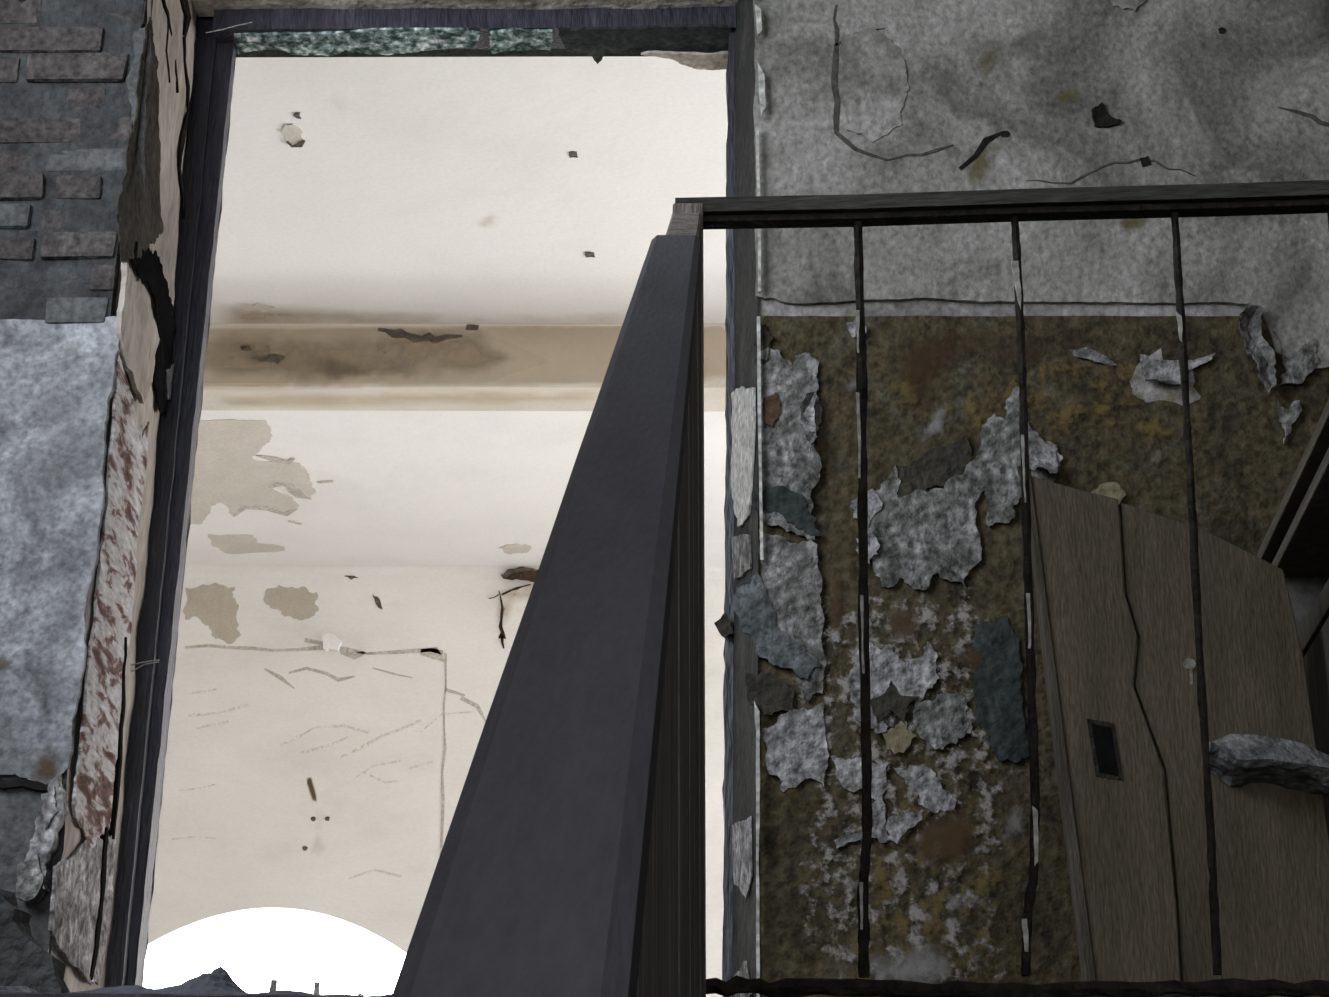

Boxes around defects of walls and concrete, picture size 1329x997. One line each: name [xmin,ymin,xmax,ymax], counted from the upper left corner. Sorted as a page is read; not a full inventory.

spalling [755,64,766,196]
crack [831,5,1004,170]
crack [1278,107,1329,127]
water stain [219,340,501,376]
spalling [0,0,176,985]
peeling [191,419,334,554]
peeling [183,583,241,644]
peeling [263,585,319,620]
flaking render [714,310,1215,997]
crack [0,779,48,791]
crack [180,638,486,854]
crack [348,869,401,879]